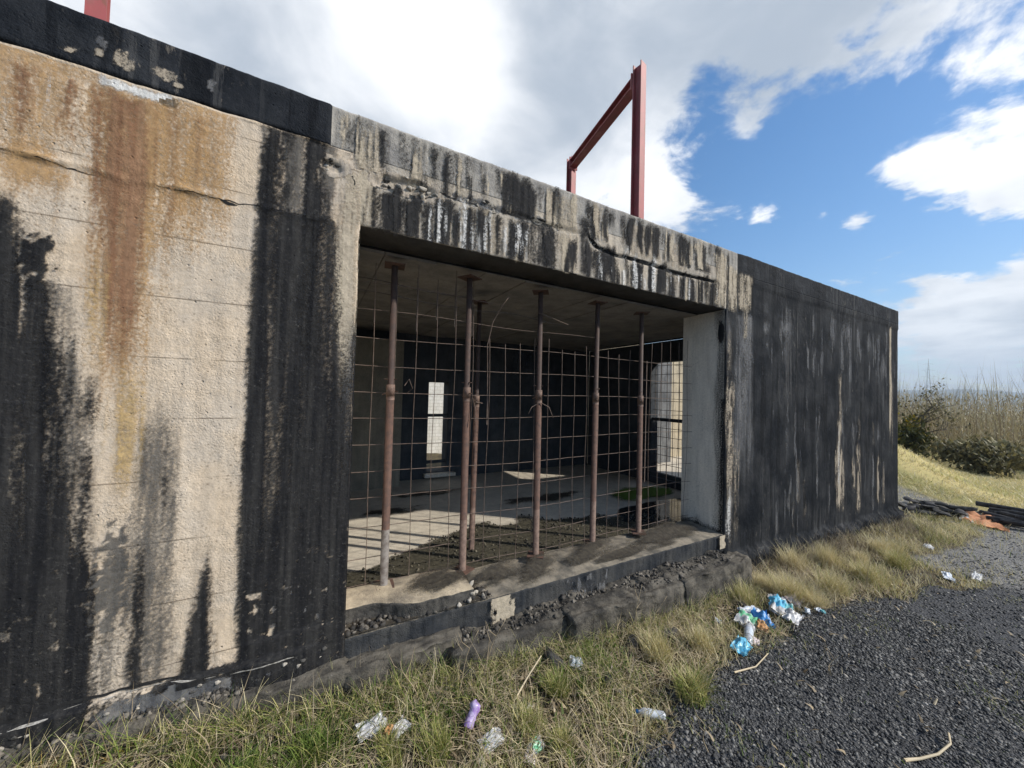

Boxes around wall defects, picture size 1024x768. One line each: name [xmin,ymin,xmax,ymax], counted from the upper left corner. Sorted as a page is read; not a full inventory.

crack [0,147,103,176]
corrosion [0,44,236,486]
crack [146,182,257,206]
crack [588,221,714,283]
leakage [0,115,753,749]
leakage [807,320,897,439]